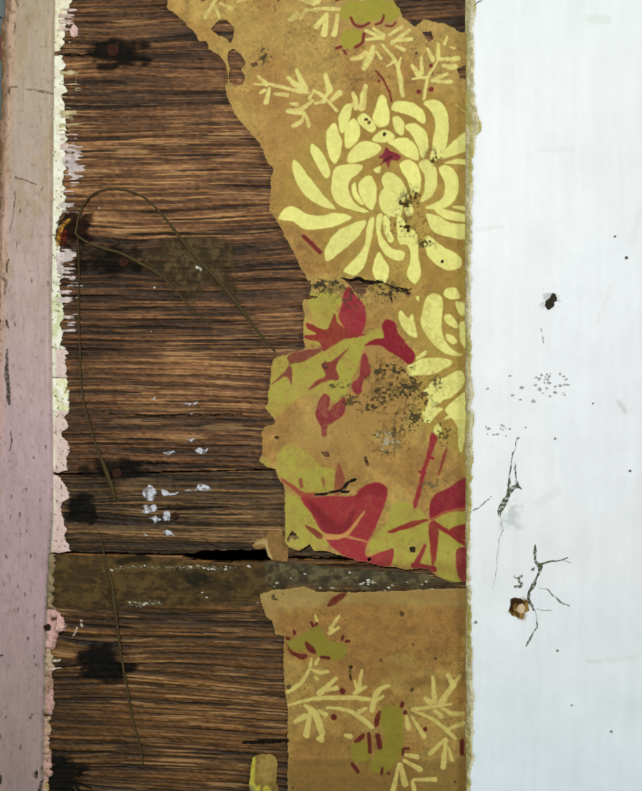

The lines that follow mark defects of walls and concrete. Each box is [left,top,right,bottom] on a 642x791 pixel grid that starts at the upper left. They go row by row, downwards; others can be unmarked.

rust [88,38,151,71]
peeling [545,293,557,310]
peeling [34,0,78,791]
crack [473,437,522,530]
crack [514,545,570,647]